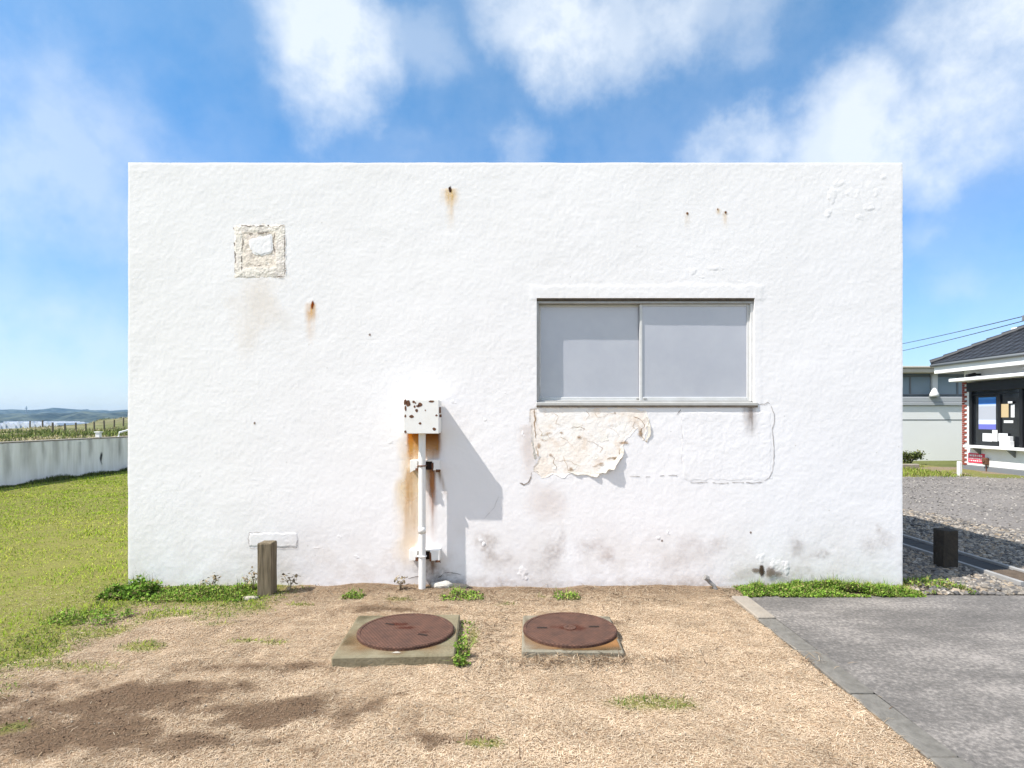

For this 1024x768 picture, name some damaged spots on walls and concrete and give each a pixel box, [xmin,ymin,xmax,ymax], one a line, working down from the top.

rust [408,434,439,453]
peeling [529,407,651,478]
rust [429,470,440,506]